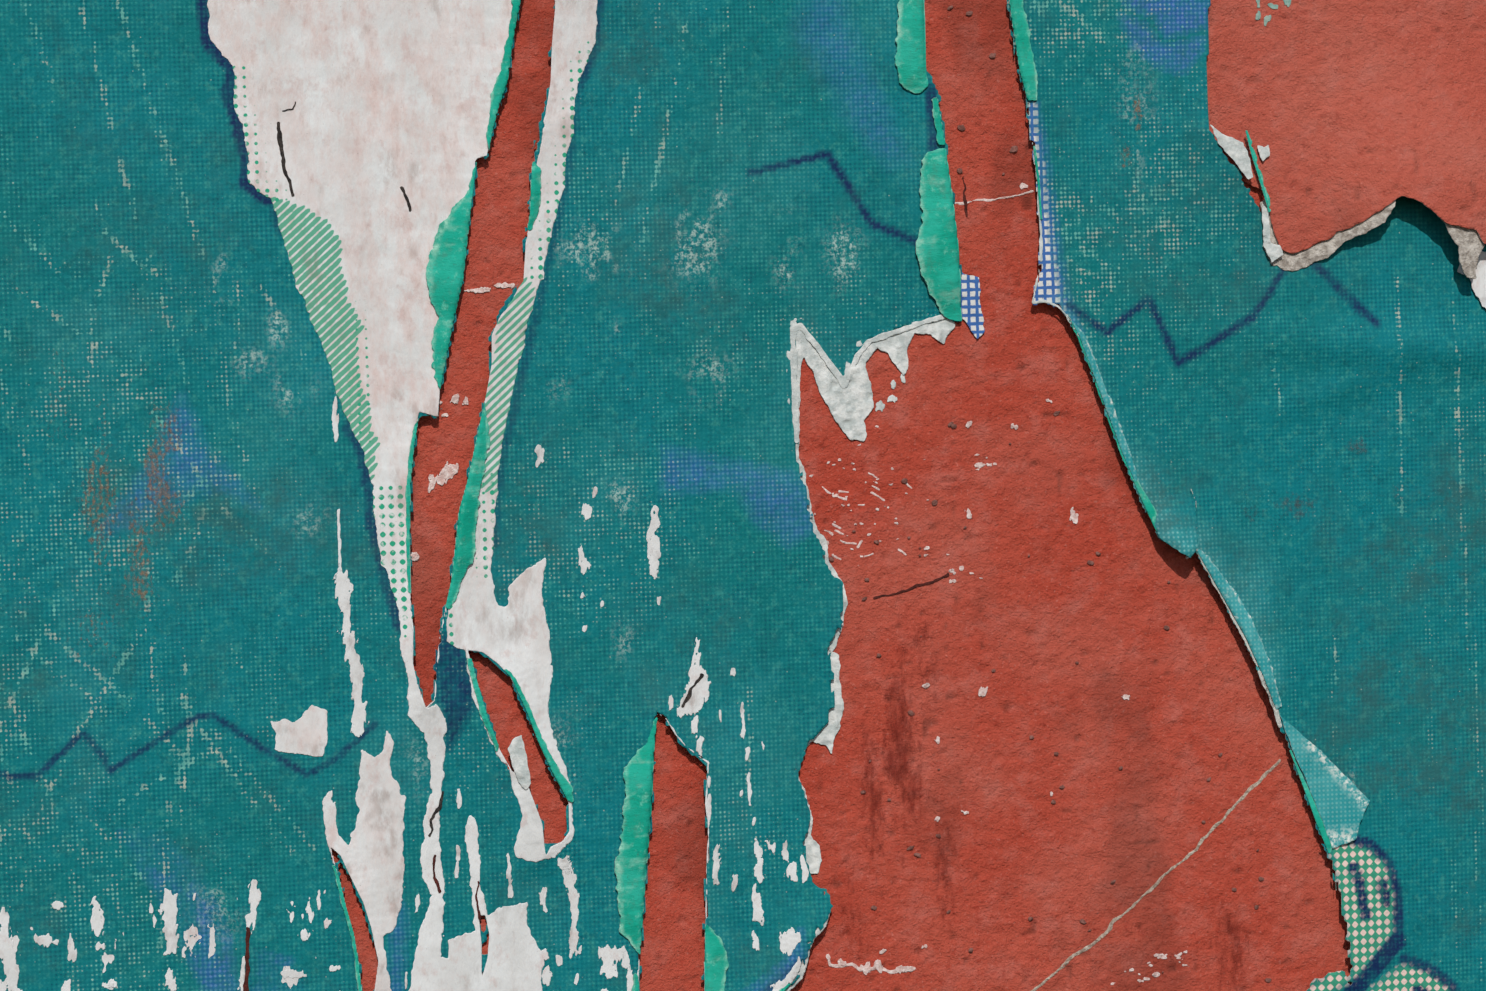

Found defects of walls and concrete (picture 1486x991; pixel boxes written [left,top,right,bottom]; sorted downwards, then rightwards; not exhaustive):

peeling [1255,0,1291,26]
peeling [1210,125,1283,262]
peeling [1457,251,1486,308]
peeling [207,0,633,991]
peeling [646,505,661,579]
peeling [786,315,955,754]
crack [873,573,949,599]
crack [1031,759,1281,991]
peeling [0,907,77,991]
peeling [90,896,124,990]
peeling [141,888,216,991]